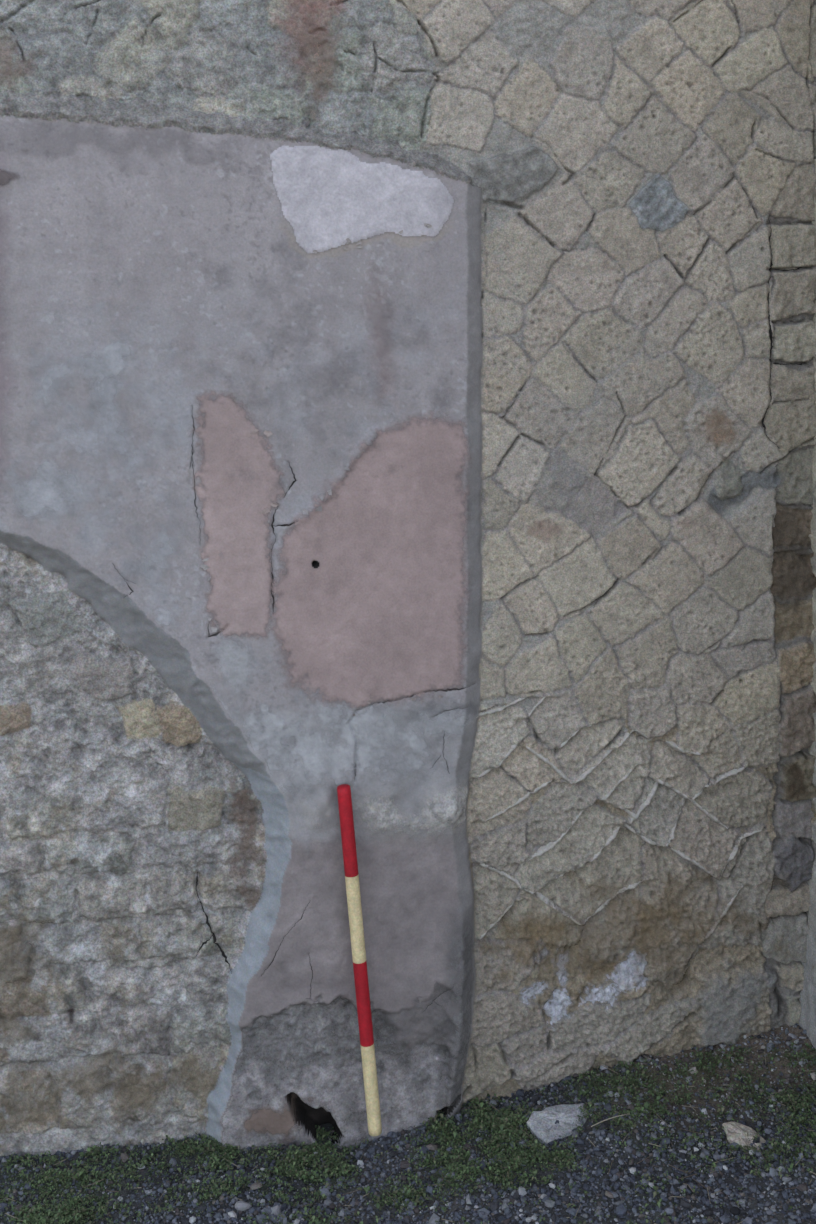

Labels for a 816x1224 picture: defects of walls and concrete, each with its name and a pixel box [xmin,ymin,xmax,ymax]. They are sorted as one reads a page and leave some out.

peeling [194,391,468,716]
crack [196,872,232,974]
flaking render [0,530,461,1156]
damp [522,940,647,1025]